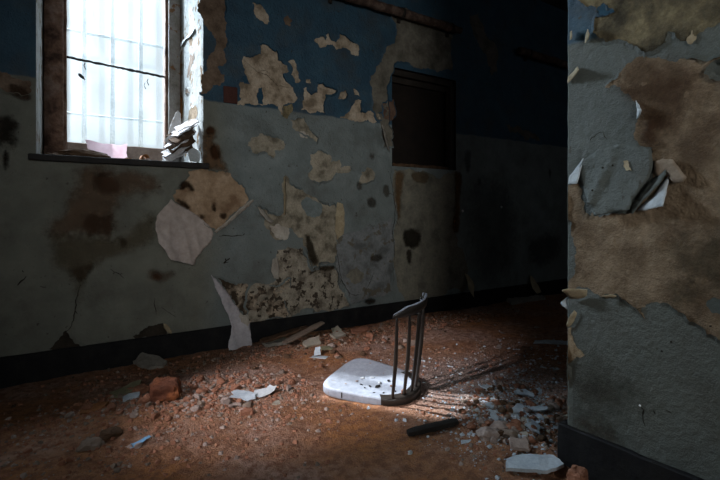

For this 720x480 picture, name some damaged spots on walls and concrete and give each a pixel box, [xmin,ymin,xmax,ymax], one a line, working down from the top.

flaking render [197,0,229,96]
flaking render [237,14,453,186]
damp [50,166,159,280]
spalling [155,168,350,350]
flaking render [561,0,720,383]